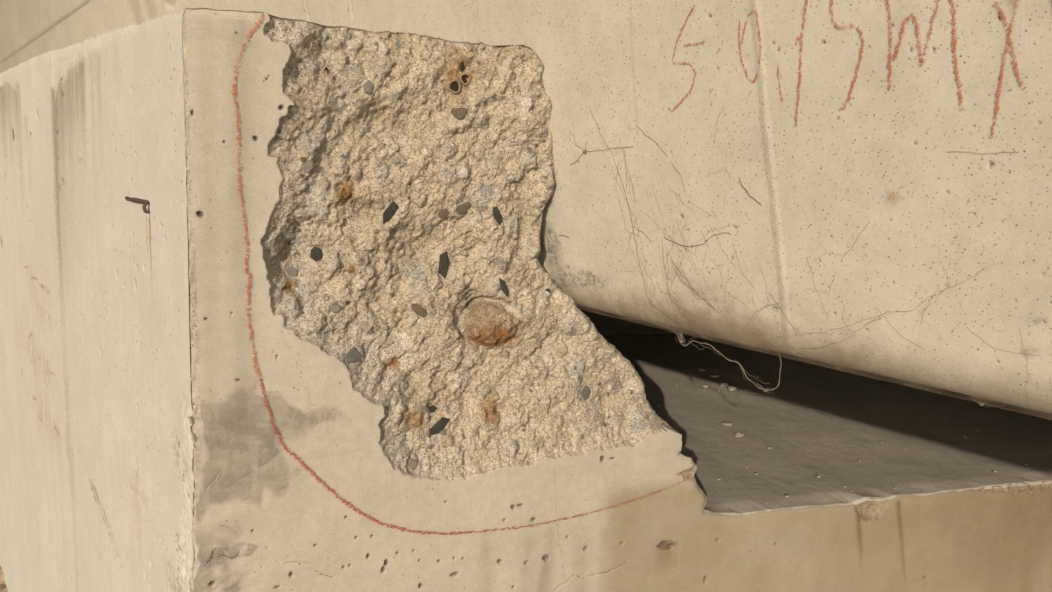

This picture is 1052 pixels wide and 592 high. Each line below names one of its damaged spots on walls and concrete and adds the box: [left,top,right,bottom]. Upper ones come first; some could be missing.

spalling [260,17,677,481]